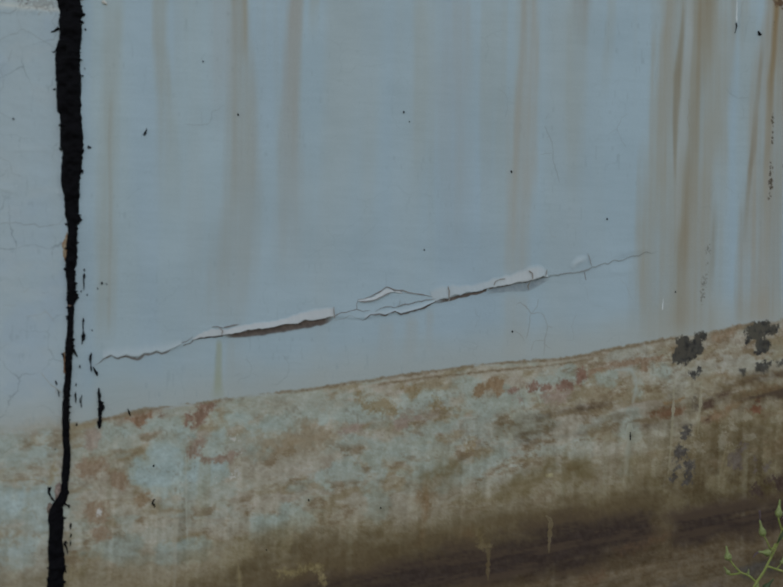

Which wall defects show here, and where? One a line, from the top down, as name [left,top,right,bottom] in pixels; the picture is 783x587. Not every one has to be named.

corrosion [73,396,344,548]
damp [182,319,783,587]
damp [500,291,533,361]
corrosion [258,0,783,421]